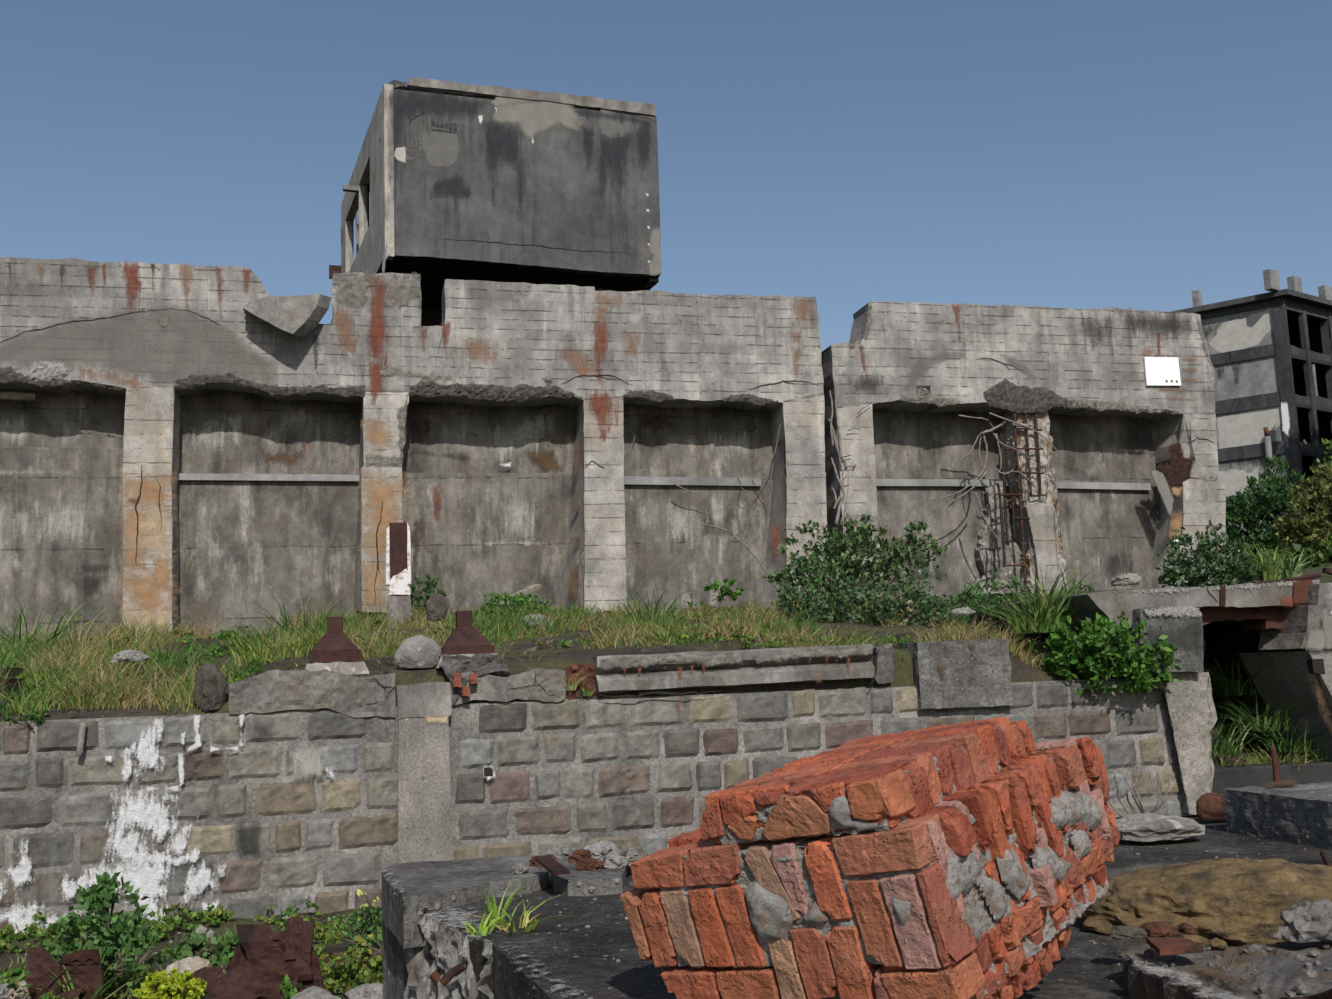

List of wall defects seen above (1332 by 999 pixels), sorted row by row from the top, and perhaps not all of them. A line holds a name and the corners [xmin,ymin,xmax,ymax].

water stain [378,90,534,203]
water stain [575,109,650,187]
corrosion [124,263,155,305]
peeling [0,309,365,397]
corrosion [369,278,385,400]
corrosion [566,295,613,375]
peeling [1198,307,1274,363]
corrosion [589,393,612,440]
peeling [1217,403,1290,449]
crack [135,467,162,565]
crack [374,500,383,605]
peeling [1218,456,1287,497]